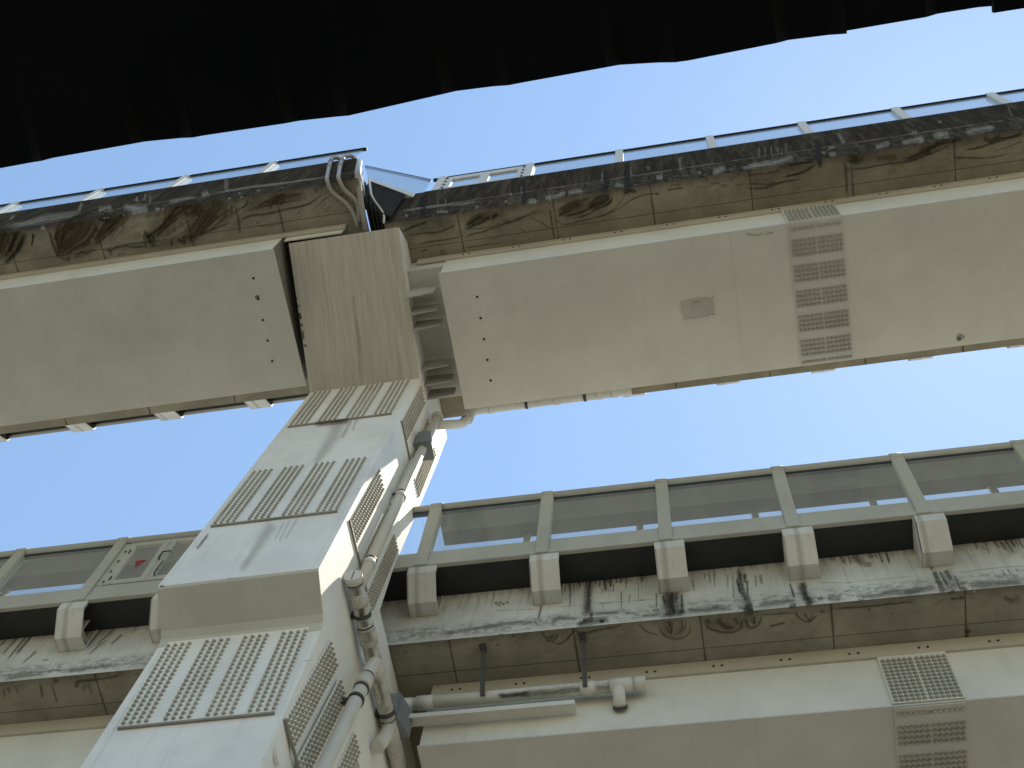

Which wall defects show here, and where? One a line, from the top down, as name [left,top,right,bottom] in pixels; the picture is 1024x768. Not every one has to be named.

water stain [564,570,840,633]
water stain [850,568,1018,610]